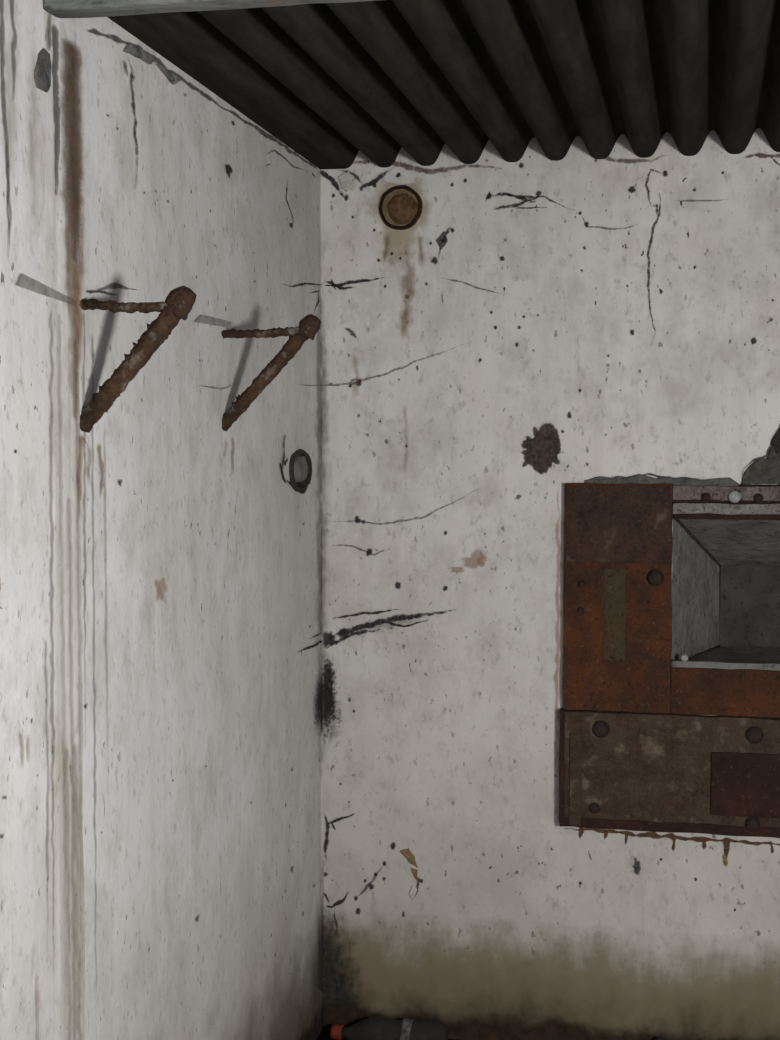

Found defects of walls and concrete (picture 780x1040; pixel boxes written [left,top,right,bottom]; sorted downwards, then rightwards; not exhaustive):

crack [486,169,720,338]
leakage [17,274,71,304]
leakage [87,283,136,295]
leakage [195,315,232,328]
rust [402,277,412,330]
spalling [584,425,780,487]
crack [299,609,451,652]
leakage [314,659,340,737]
rust [565,827,780,866]
crack [324,814,354,934]
leakage [247,921,780,1040]